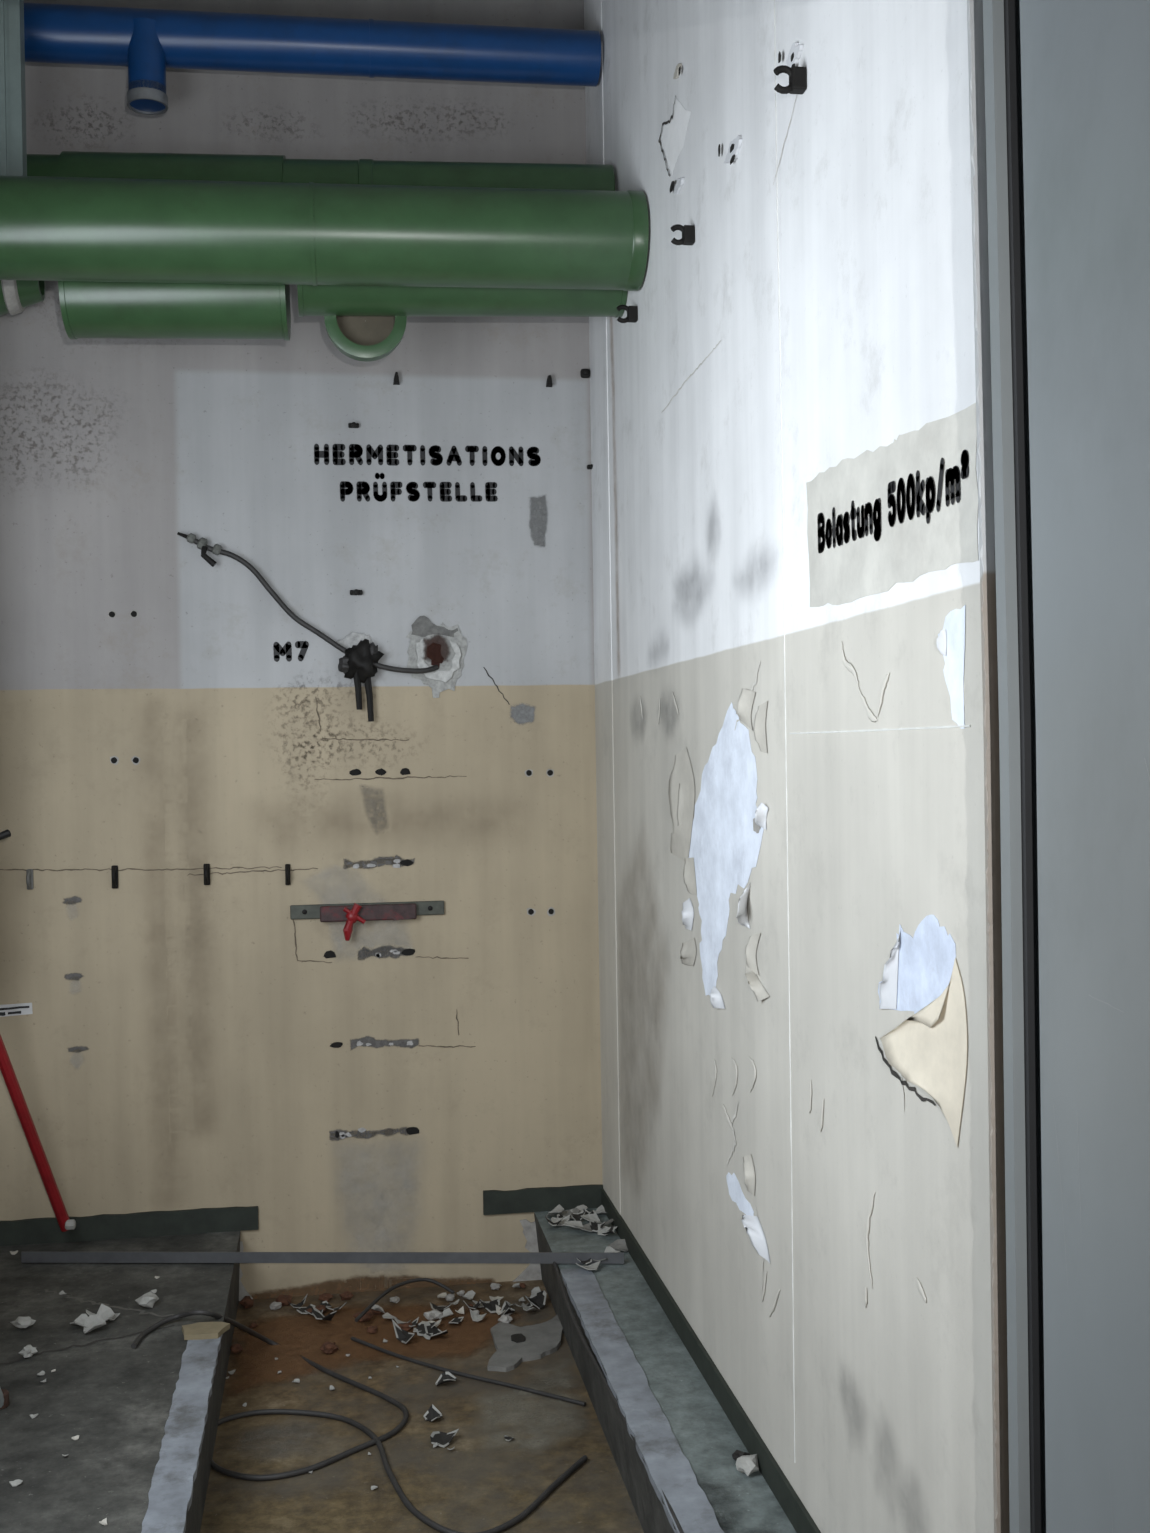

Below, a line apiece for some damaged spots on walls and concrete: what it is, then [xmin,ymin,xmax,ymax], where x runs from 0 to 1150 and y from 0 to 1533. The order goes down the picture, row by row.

spalling [406,616,467,698]
peeling [936,605,966,729]
peeling [668,662,770,1009]
peeling [875,915,968,1147]
peeling [726,1102,770,1290]